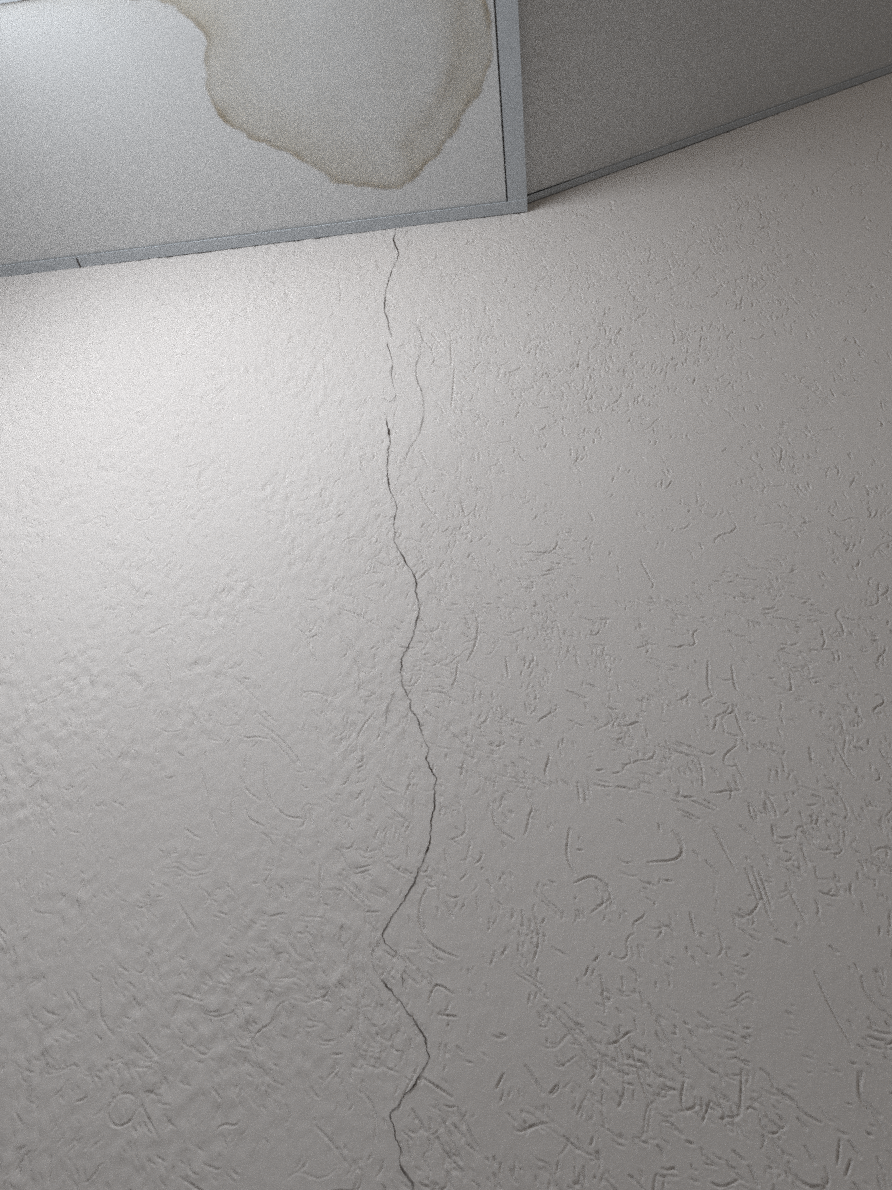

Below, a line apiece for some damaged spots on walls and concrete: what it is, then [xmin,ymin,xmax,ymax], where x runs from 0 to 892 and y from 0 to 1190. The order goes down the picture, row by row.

crack [384,228,399,382]
crack [382,421,437,948]
crack [383,981,430,1184]